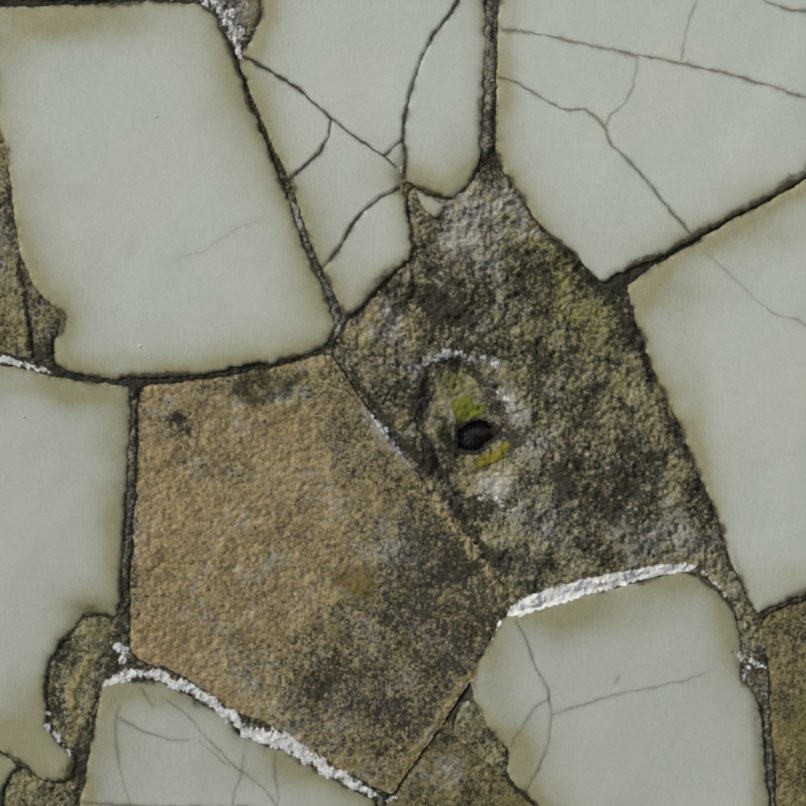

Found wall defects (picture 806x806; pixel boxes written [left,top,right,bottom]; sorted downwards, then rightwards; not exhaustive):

water stain [200,0,246,60]
crack [501,29,588,45]
crack [620,51,764,84]
crack [242,0,460,271]
crack [497,76,690,234]
peeling [415,189,444,217]
efflorescence [416,348,500,369]
efflorescence [491,563,726,640]
spalling [46,615,110,749]
water stain [104,642,397,802]
spalling [453,699,508,775]
spalling [3,768,81,806]